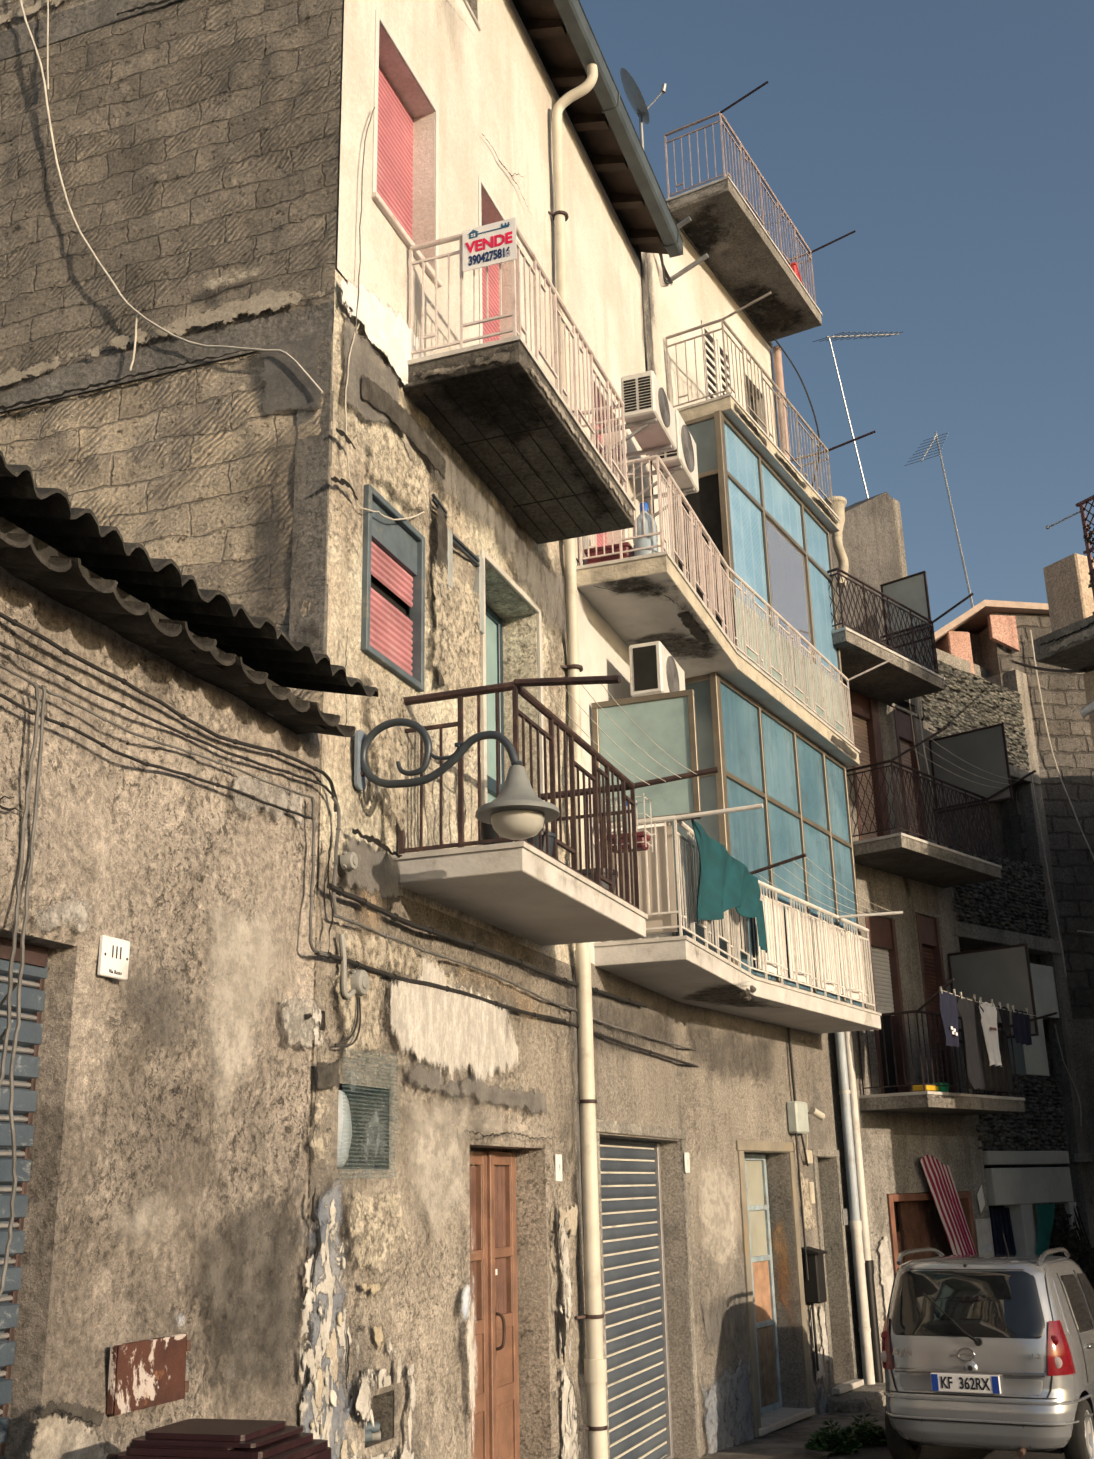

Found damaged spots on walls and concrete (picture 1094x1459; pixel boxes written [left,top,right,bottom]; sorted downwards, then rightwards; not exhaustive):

leakage [682,205,728,254]
leakage [737,284,802,333]
leakage [202,1190,306,1399]
peeling [299,1181,418,1459]
peeling [556,1203,581,1459]